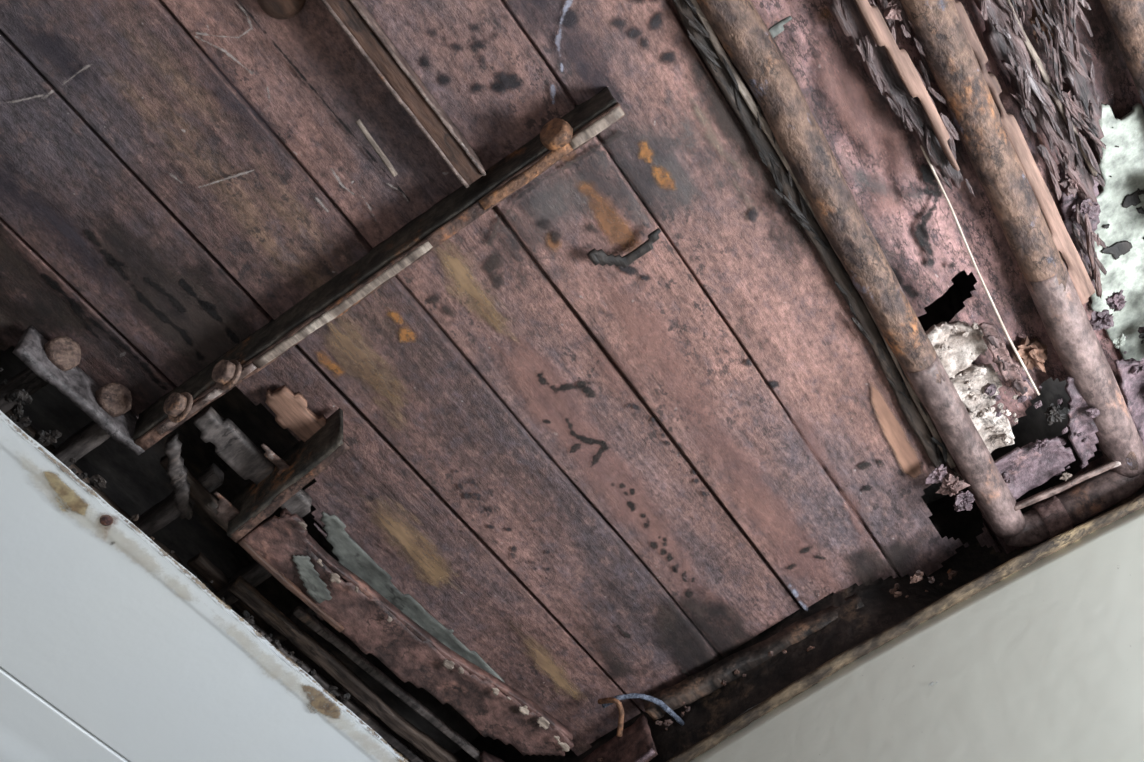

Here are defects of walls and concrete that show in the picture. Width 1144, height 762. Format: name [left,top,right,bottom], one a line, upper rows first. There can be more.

water stain [555,0,578,72]
water stain [611,0,662,48]
water stain [472,72,522,95]
corrosion [639,142,675,190]
flaking render [1088,103,1144,361]
corrosion [12,86,626,456]
flaking render [925,320,1034,454]
peeling [858,386,921,478]
spalling [44,472,88,515]
corrosion [7,420,405,760]
water stain [656,597,751,670]
peeling [492,688,570,752]